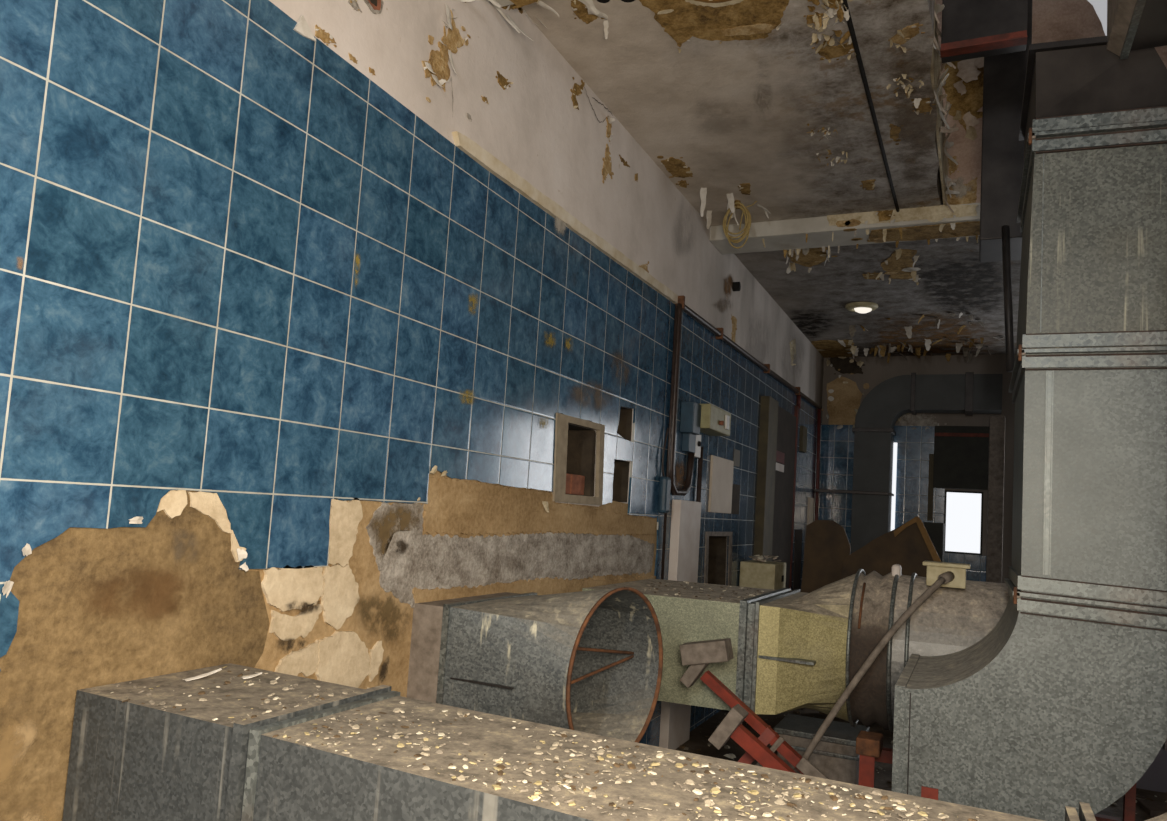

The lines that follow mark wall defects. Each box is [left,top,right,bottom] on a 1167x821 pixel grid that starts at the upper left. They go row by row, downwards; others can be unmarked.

peeling [293,15,337,48]
spalling [348,0,384,14]
peeling [422,0,560,103]
peeling [571,0,609,39]
flaking render [639,0,789,53]
peeling [570,77,585,110]
peeling [602,116,638,184]
peeling [783,0,984,285]
peeling [657,156,712,230]
peeling [727,183,770,218]
flaking render [811,313,1004,430]
peeling [0,465,657,821]